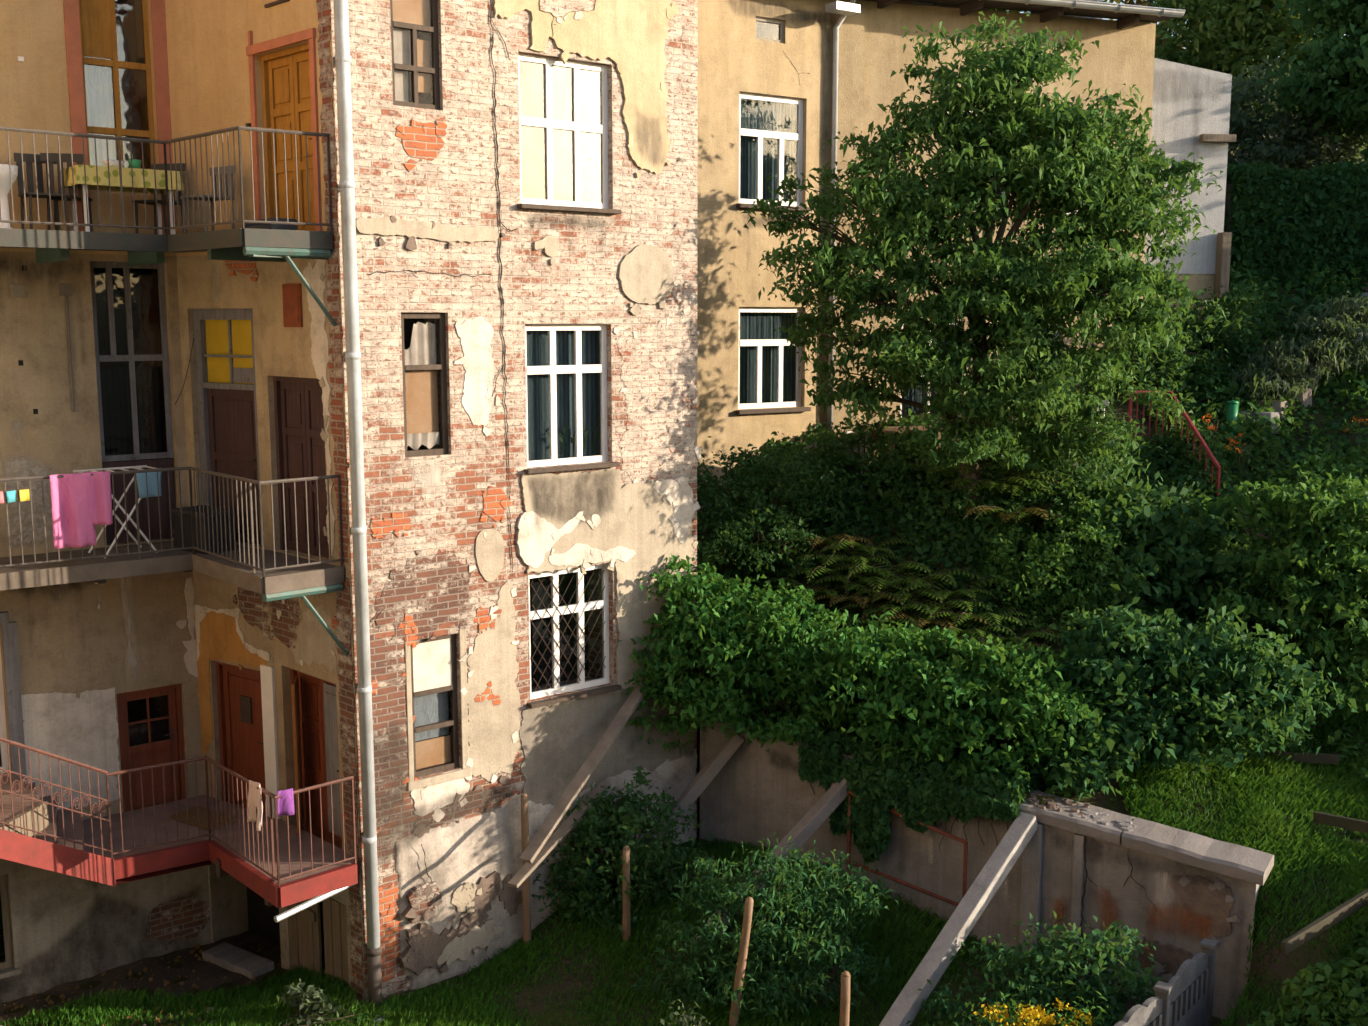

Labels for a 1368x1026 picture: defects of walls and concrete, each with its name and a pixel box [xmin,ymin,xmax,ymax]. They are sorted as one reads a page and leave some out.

crack [367,0,518,577]
flaking render [176,0,523,1002]
peeling [479,486,636,574]
water stain [531,475,607,519]
peeling [633,475,700,548]
crack [1080,836,1157,939]